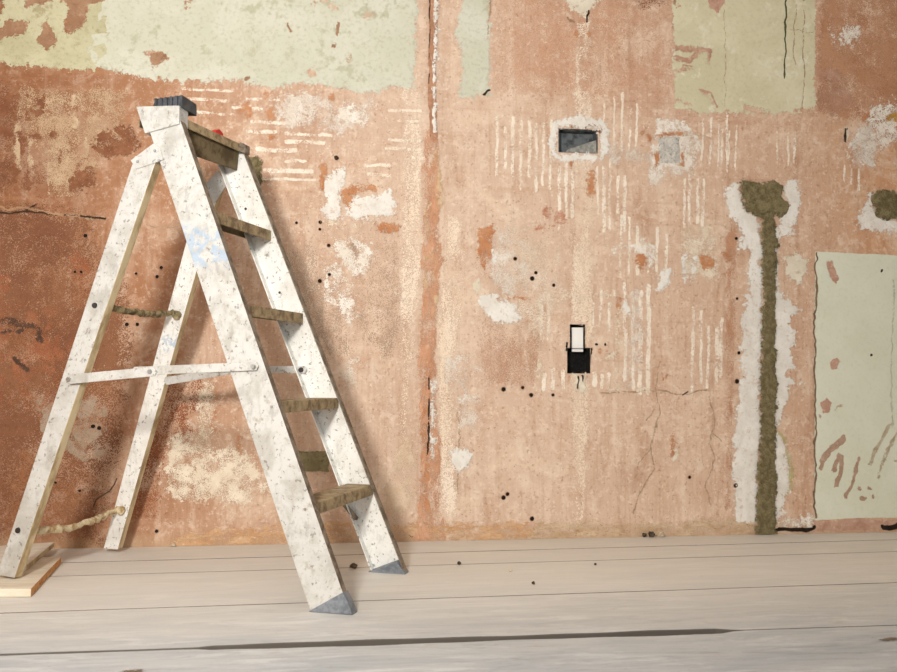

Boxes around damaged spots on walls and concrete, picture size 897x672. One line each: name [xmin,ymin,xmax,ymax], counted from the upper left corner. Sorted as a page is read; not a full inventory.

peeling [0,0,419,101]
crack [0,203,113,223]
peeling [318,155,339,190]
crack [600,361,722,515]
peeling [812,251,897,532]